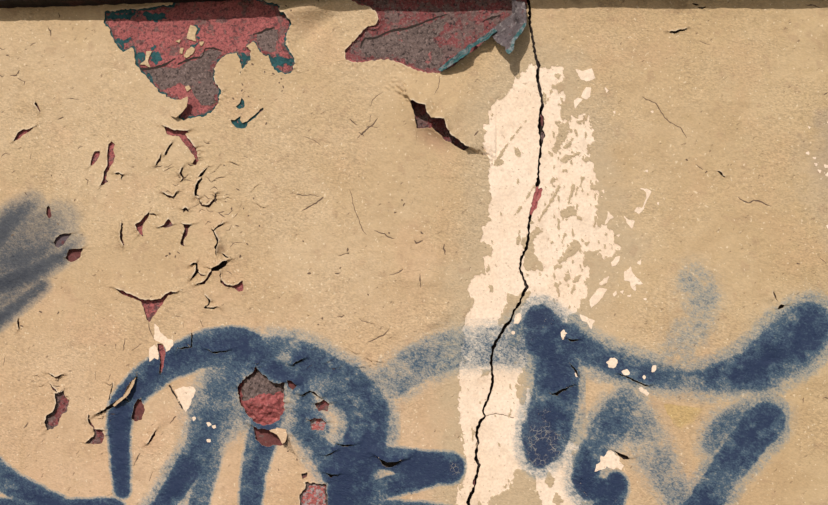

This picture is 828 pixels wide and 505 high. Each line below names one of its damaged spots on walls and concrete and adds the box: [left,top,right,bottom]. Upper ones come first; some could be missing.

peeling [345,0,527,73]
crack [667,26,709,45]
peeling [104,0,295,165]
crack [350,93,381,136]
crack [527,0,545,187]
crack [350,191,394,239]
peeling [404,63,643,329]
spalling [238,367,297,447]
peeling [456,376,519,505]
crack [466,207,535,505]
crack [552,364,578,396]
peeling [595,450,629,472]